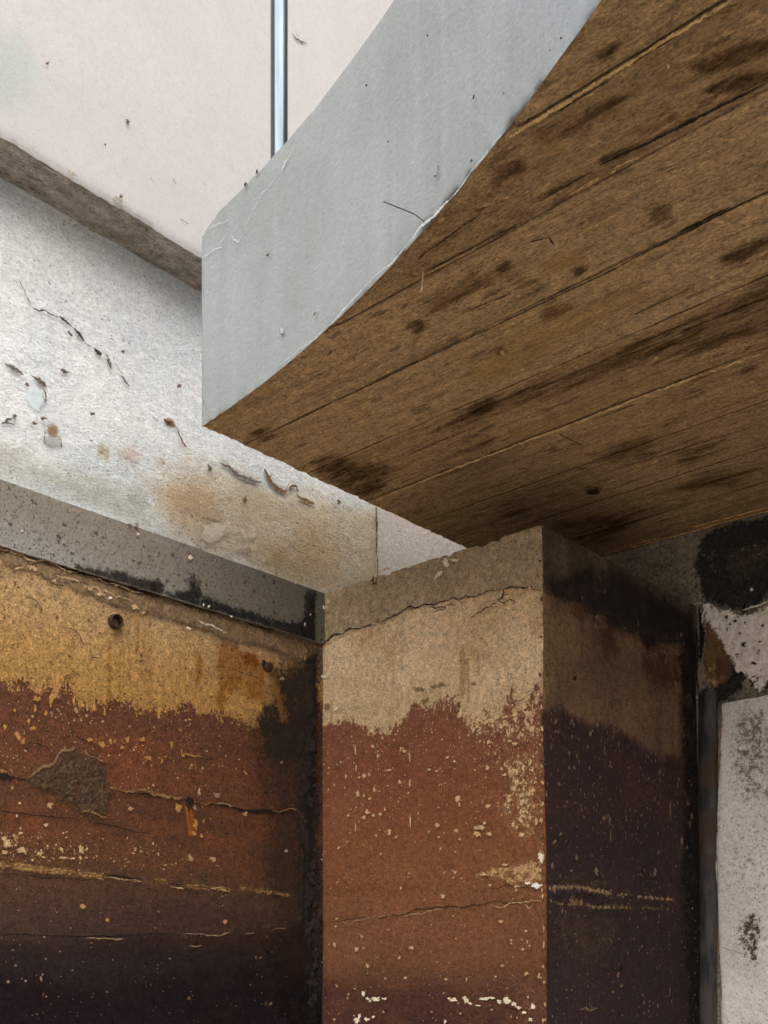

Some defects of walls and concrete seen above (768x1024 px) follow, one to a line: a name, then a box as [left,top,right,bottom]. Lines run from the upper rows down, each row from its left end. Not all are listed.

crack [19,280,130,387]
flaking render [25,375,62,448]
flaking render [202,512,226,543]
water stain [694,515,768,614]
peeling [1,802,193,870]
spalling [3,693,223,820]
rust [175,789,205,838]
crack [0,547,582,1010]
water stain [548,564,746,1024]